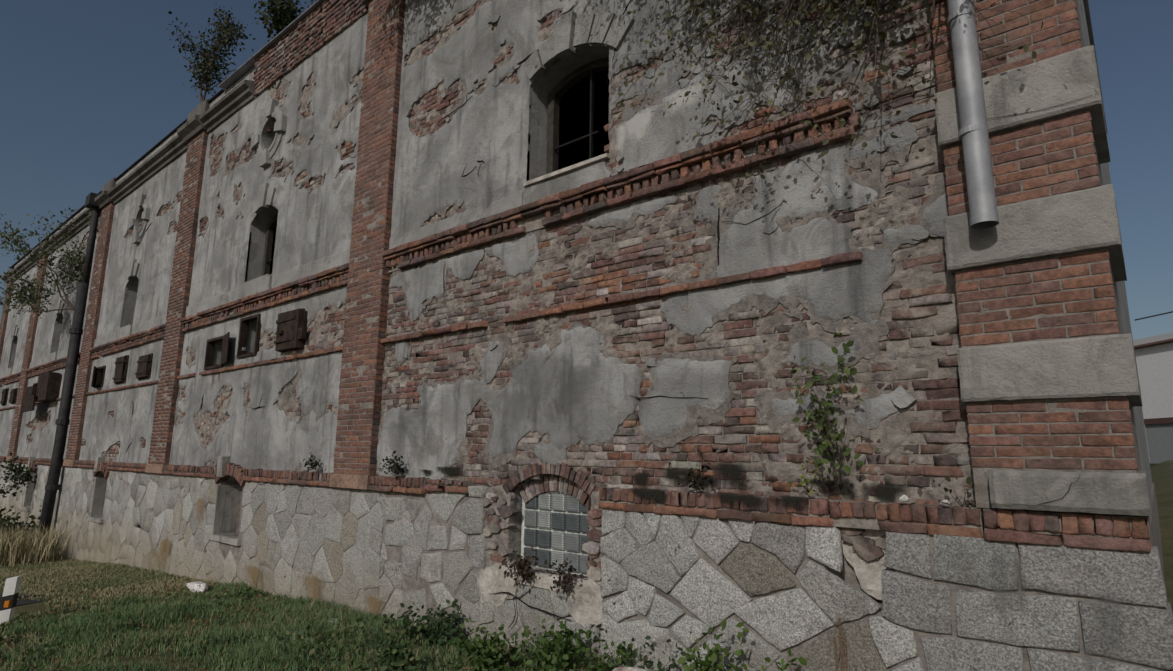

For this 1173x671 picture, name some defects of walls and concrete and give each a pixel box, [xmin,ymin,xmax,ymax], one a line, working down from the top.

flaking render [197,126,256,238]
flaking render [268,67,364,194]
crack [715,181,785,266]
flaking render [176,380,252,449]
flaking render [272,298,346,424]
flaking render [377,0,976,628]